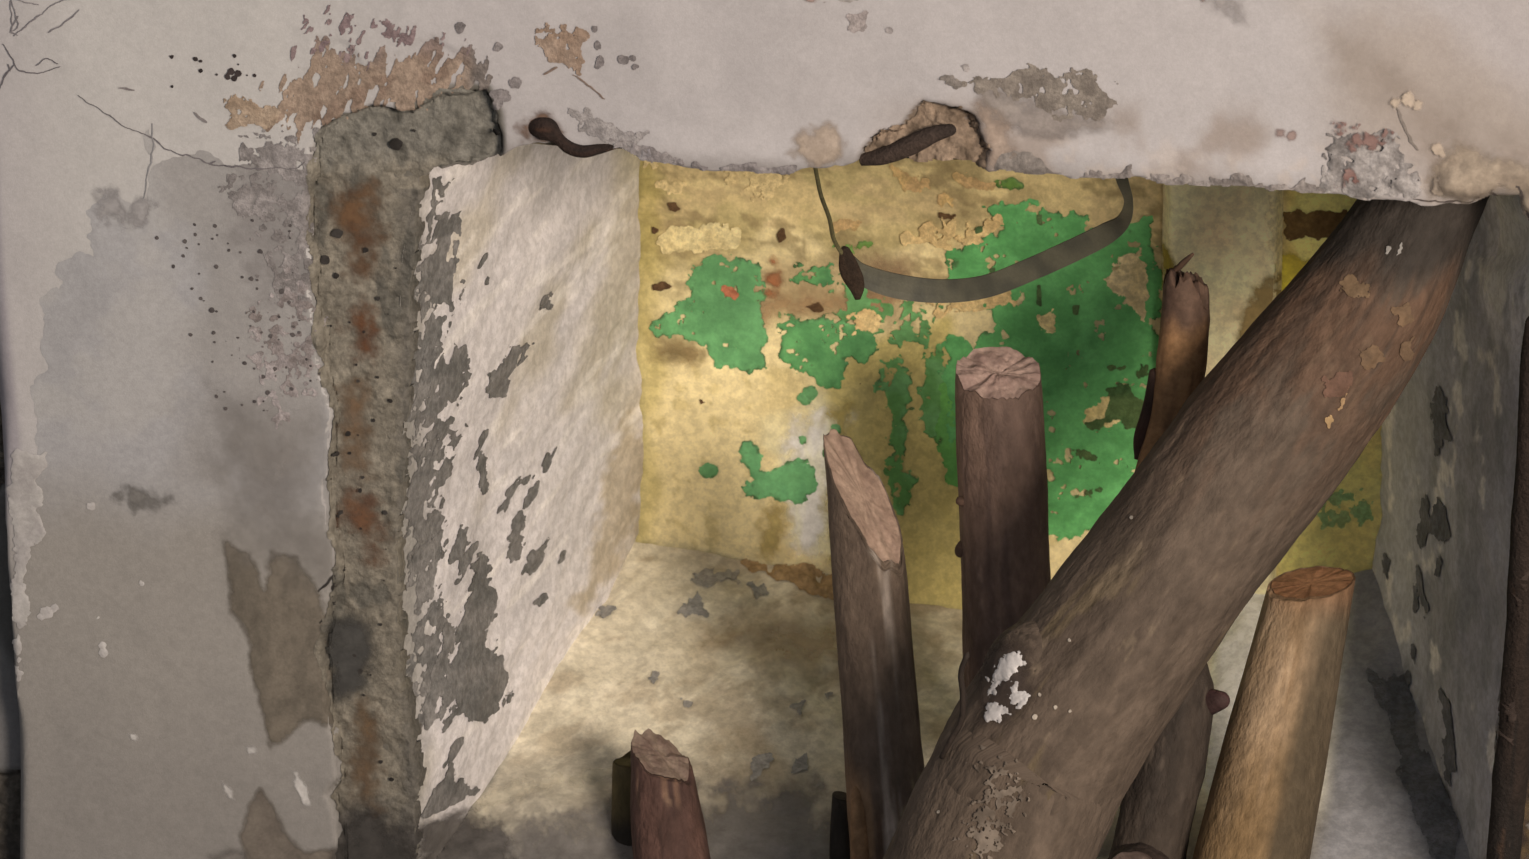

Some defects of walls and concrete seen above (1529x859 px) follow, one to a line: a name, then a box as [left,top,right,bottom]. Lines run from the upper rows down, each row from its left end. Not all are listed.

crack [0,0,305,198]
flaking render [535,22,639,76]
peeling [864,63,1118,279]
peeling [0,22,566,859]
peeling [568,107,1163,541]
flaking render [1430,386,1452,457]
flaking render [1382,552,1390,580]
flaking render [1412,494,1451,619]
corrosion [1486,316,1529,859]
flaking render [1366,644,1460,859]